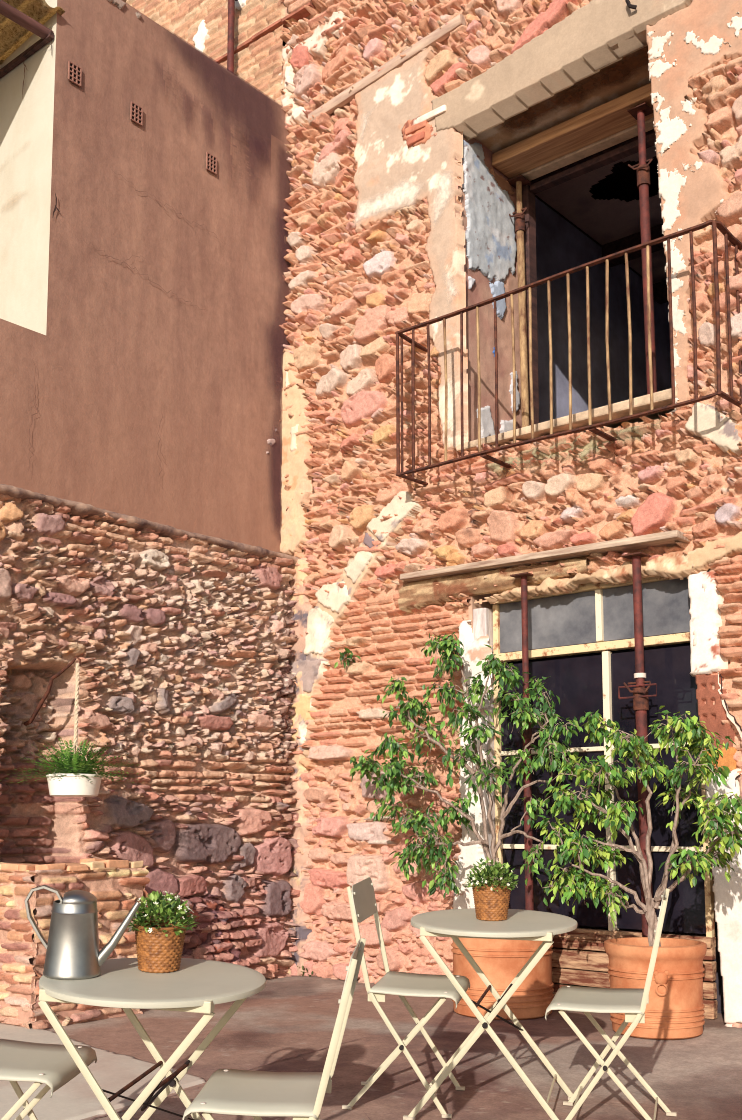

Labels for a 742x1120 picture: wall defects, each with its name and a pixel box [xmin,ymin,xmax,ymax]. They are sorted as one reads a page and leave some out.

leakage [174,34,275,160]
flaking render [353,45,521,451]
flaking render [645,0,742,421]
peeling [688,569,728,677]
crack [718,672,742,738]